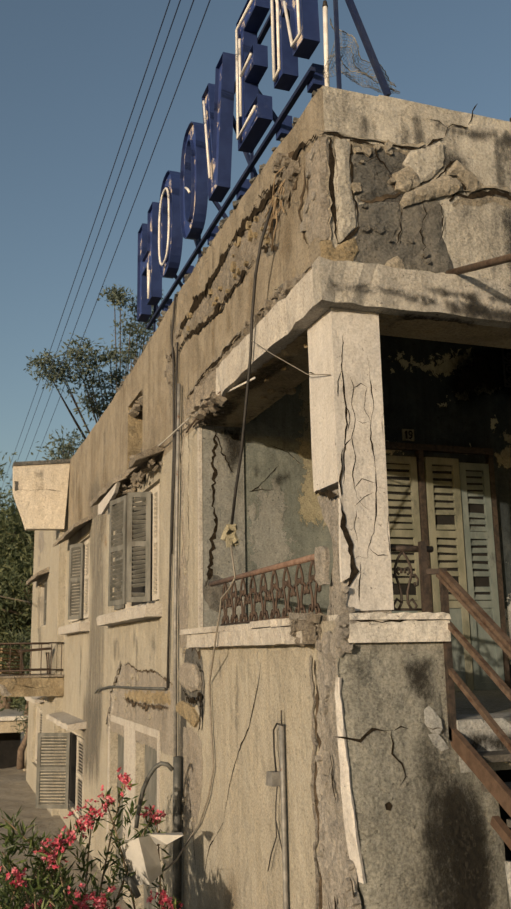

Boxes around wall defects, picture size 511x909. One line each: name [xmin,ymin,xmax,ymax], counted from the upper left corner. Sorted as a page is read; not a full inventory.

flaking render [164,137,454,396]
crack [170,103,511,358]
leakage [373,167,431,205]
leakage [379,287,511,323]
leakage [454,130,511,186]
flaking render [110,555,205,834]
crack [205,427,234,587]
flaking render [184,335,392,909]
crack [308,655,408,909]
crack [315,337,426,624]
flaking render [424,706,449,752]
leakage [422,752,494,909]